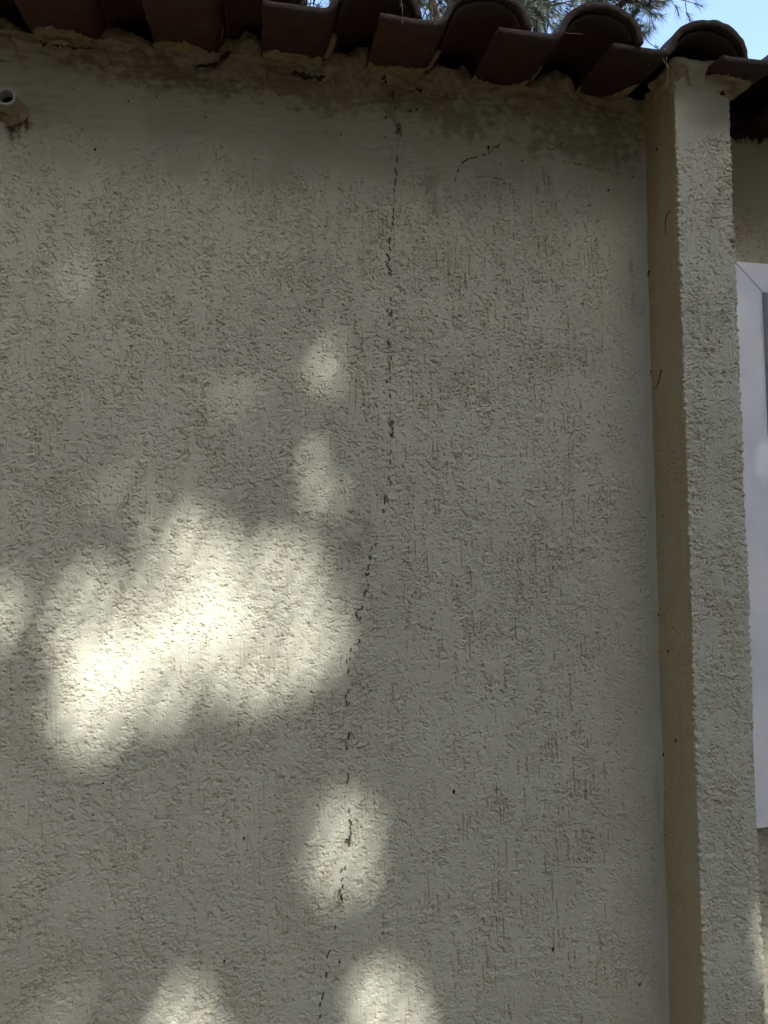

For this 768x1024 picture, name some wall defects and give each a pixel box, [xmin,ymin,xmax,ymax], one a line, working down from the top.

crack [455,143,502,182]